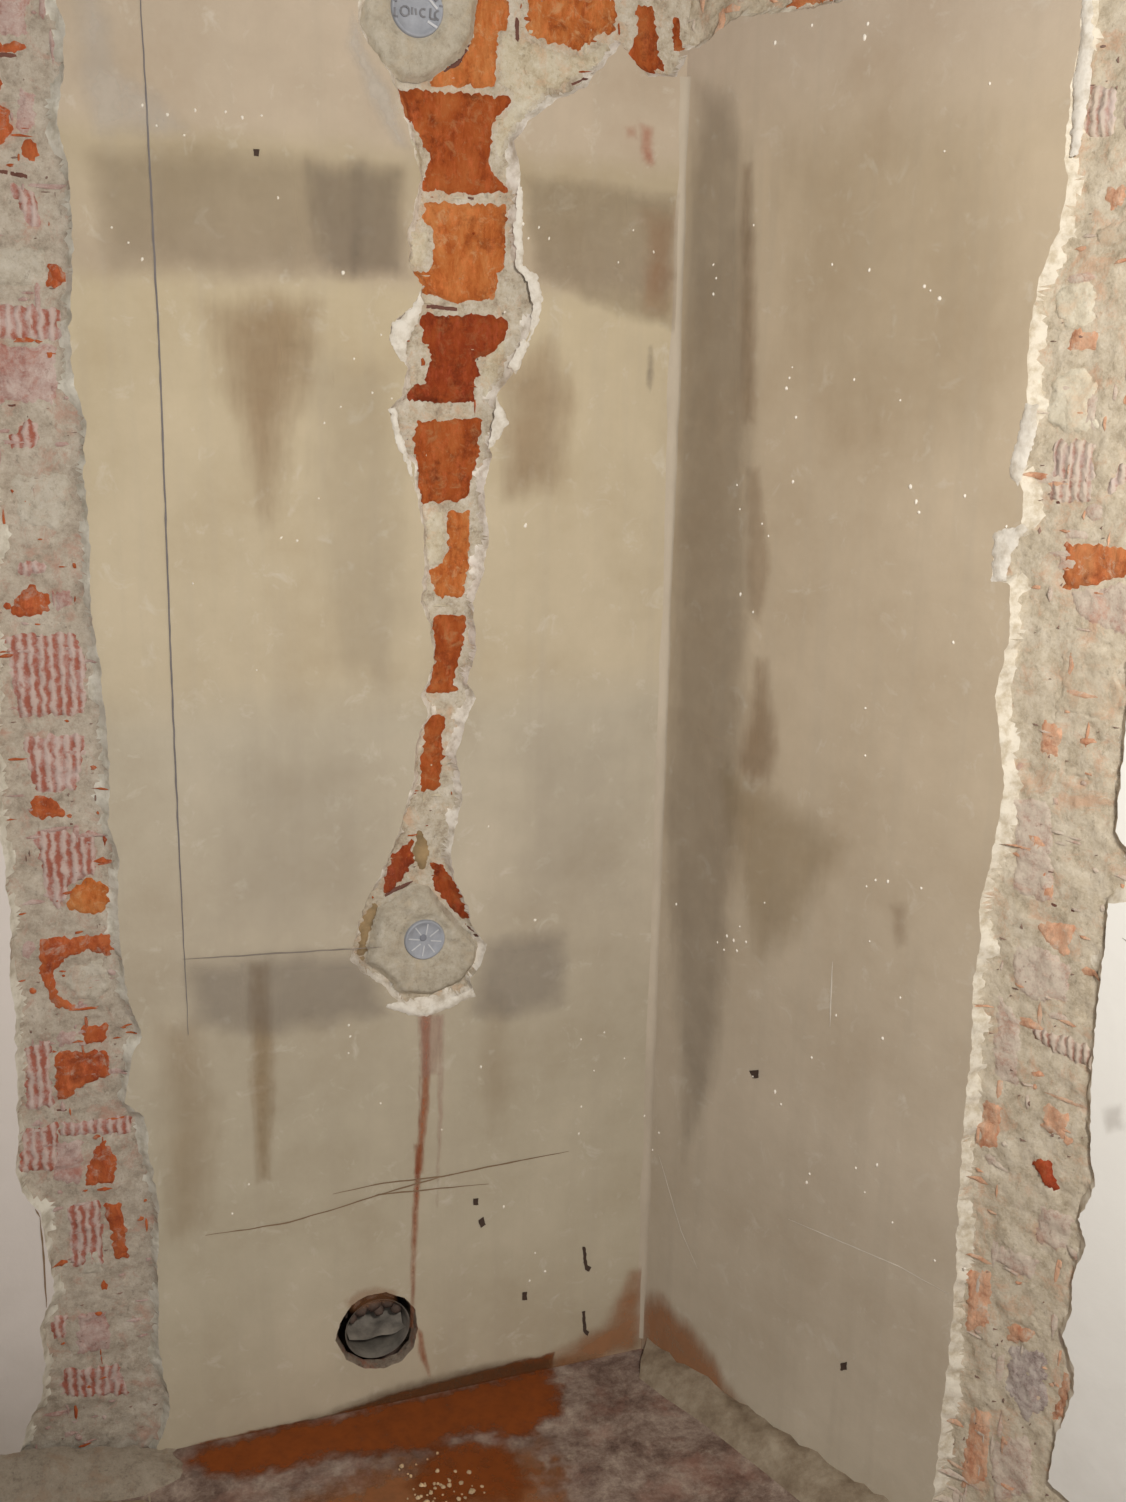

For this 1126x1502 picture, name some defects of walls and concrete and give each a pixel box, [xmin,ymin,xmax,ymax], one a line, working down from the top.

spalling [0,0,170,1451]
spalling [350,0,842,1017]
spalling [932,0,1126,1502]